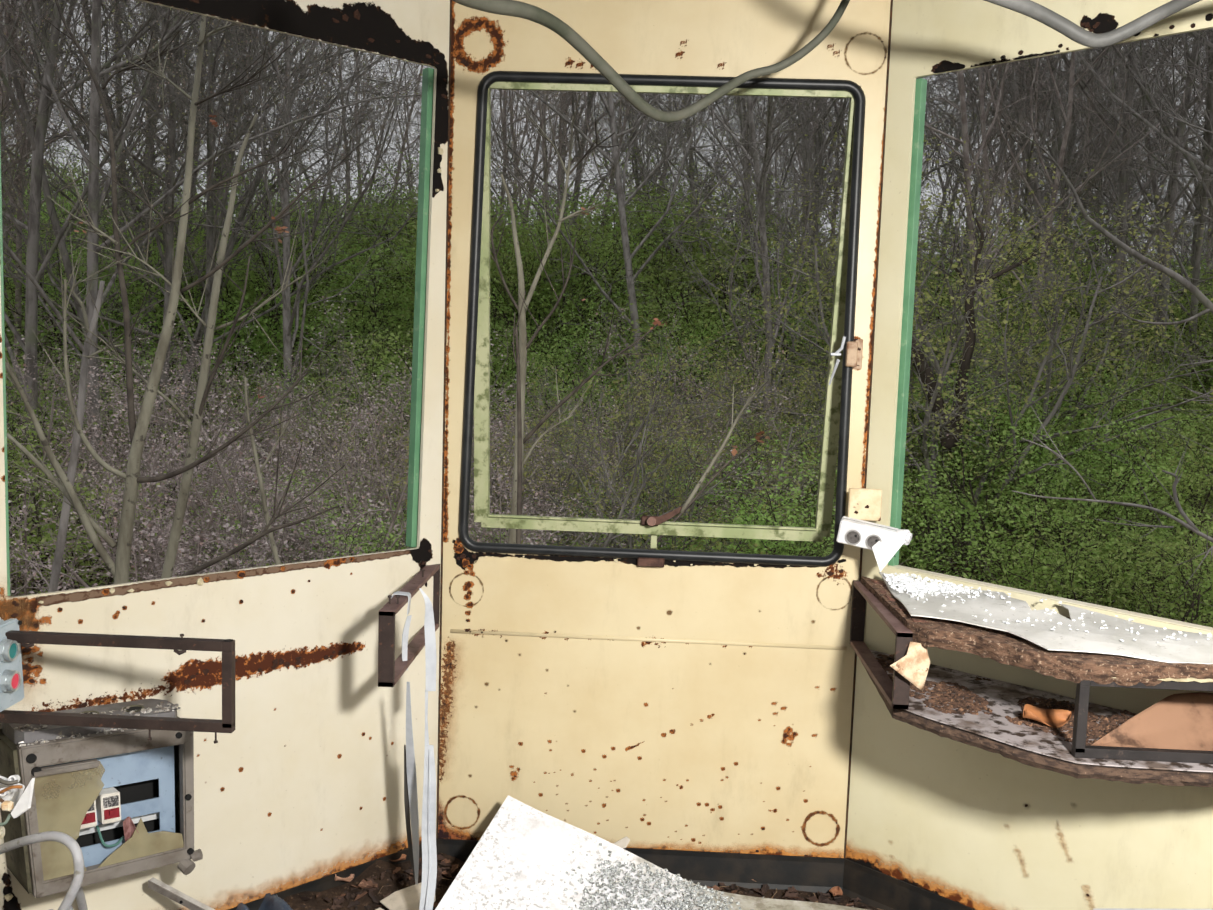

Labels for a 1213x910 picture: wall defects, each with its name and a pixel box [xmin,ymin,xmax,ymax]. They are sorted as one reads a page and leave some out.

corrosion [931,44,1070,73]
corrosion [1080,13,1119,34]
peeling [432,142,444,198]
corrosion [145,0,509,642]
corrosion [854,108,885,488]
corrosion [0,588,63,685]
corrosion [31,641,365,712]
corrosion [439,637,457,782]
corrosion [758,702,817,747]
corrosion [438,795,482,840]
corrosion [214,837,422,910]
corrosion [626,799,997,910]